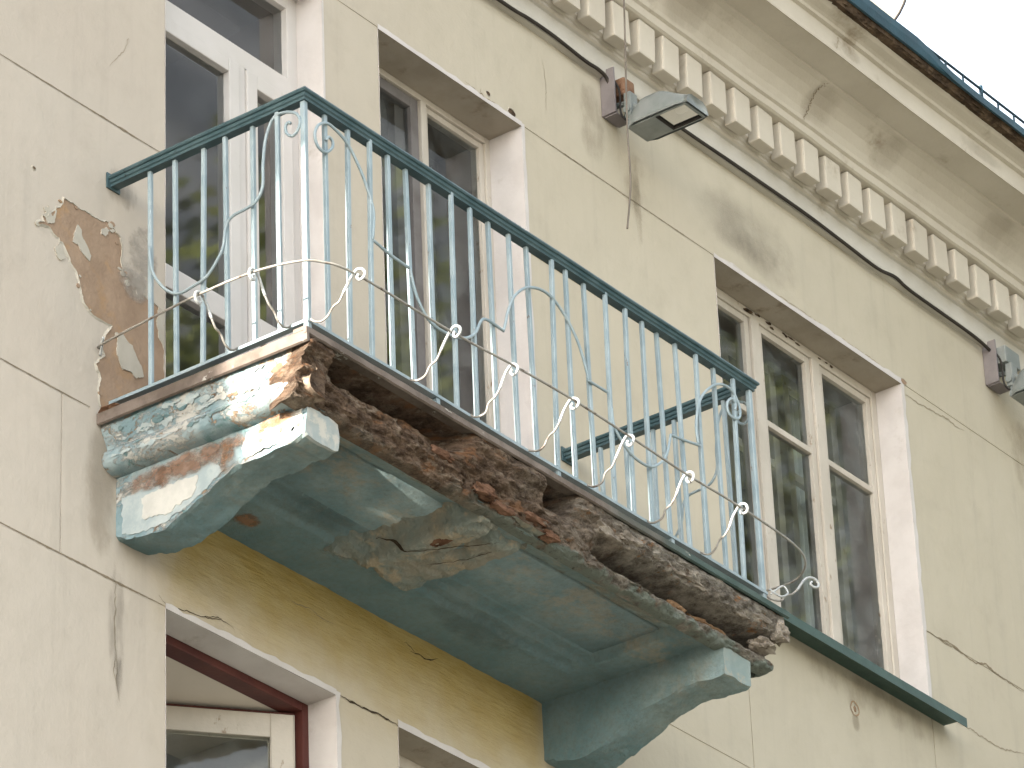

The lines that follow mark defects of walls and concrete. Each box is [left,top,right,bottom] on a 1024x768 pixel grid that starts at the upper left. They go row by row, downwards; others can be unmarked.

peeling [34,197,165,407]
crack [1,523,231,701]
crack [376,537,495,565]
spalling [111,336,790,678]
crack [928,631,1021,691]